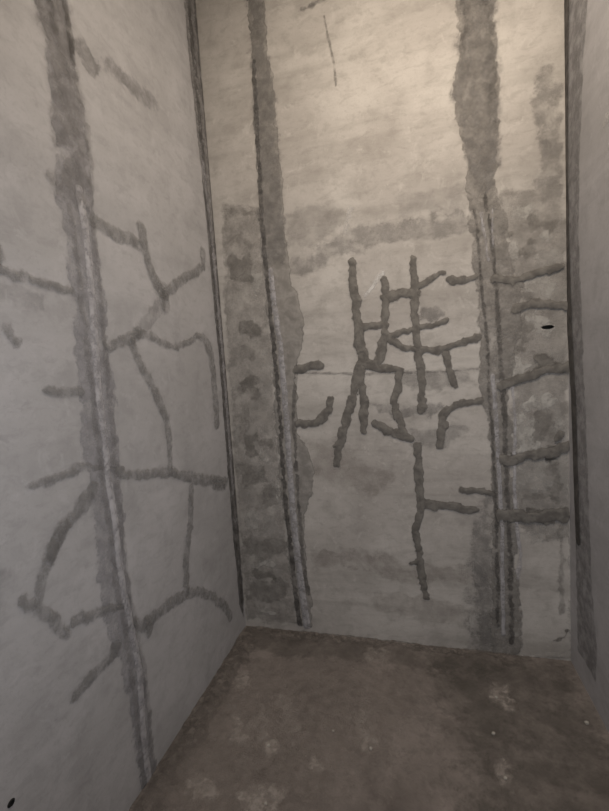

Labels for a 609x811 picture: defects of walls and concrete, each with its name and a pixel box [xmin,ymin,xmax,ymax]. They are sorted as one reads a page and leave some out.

crack [0,250,74,293]
crack [89,216,205,298]
crack [19,328,232,702]
crack [292,255,570,600]
flaking render [509,309,570,510]